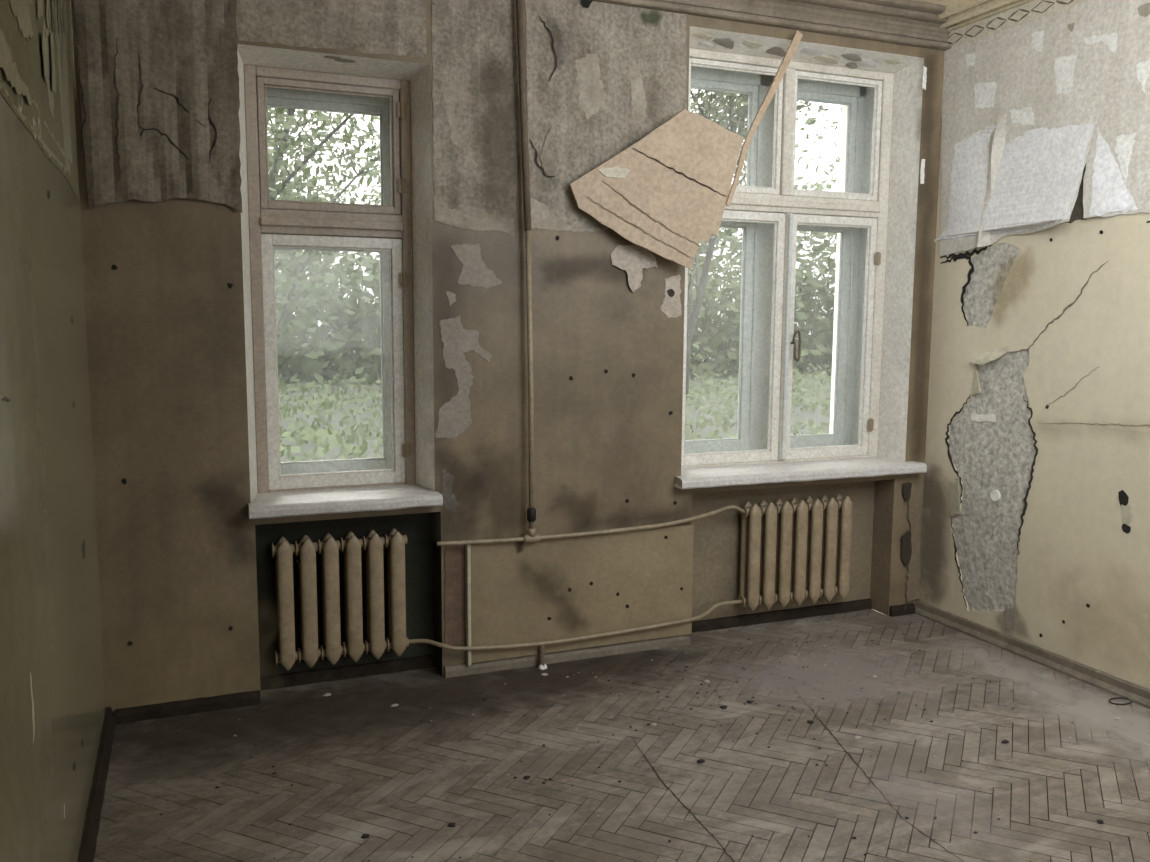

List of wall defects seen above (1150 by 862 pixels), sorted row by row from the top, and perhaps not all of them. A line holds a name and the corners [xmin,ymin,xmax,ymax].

crack [114,40,217,175]
peeling [435,244,502,438]
peeling [610,244,682,318]
spalling [940,243,1020,328]
crack [1026,261,1108,351]
peeling [442,469,458,513]
spalling [945,347,1038,630]